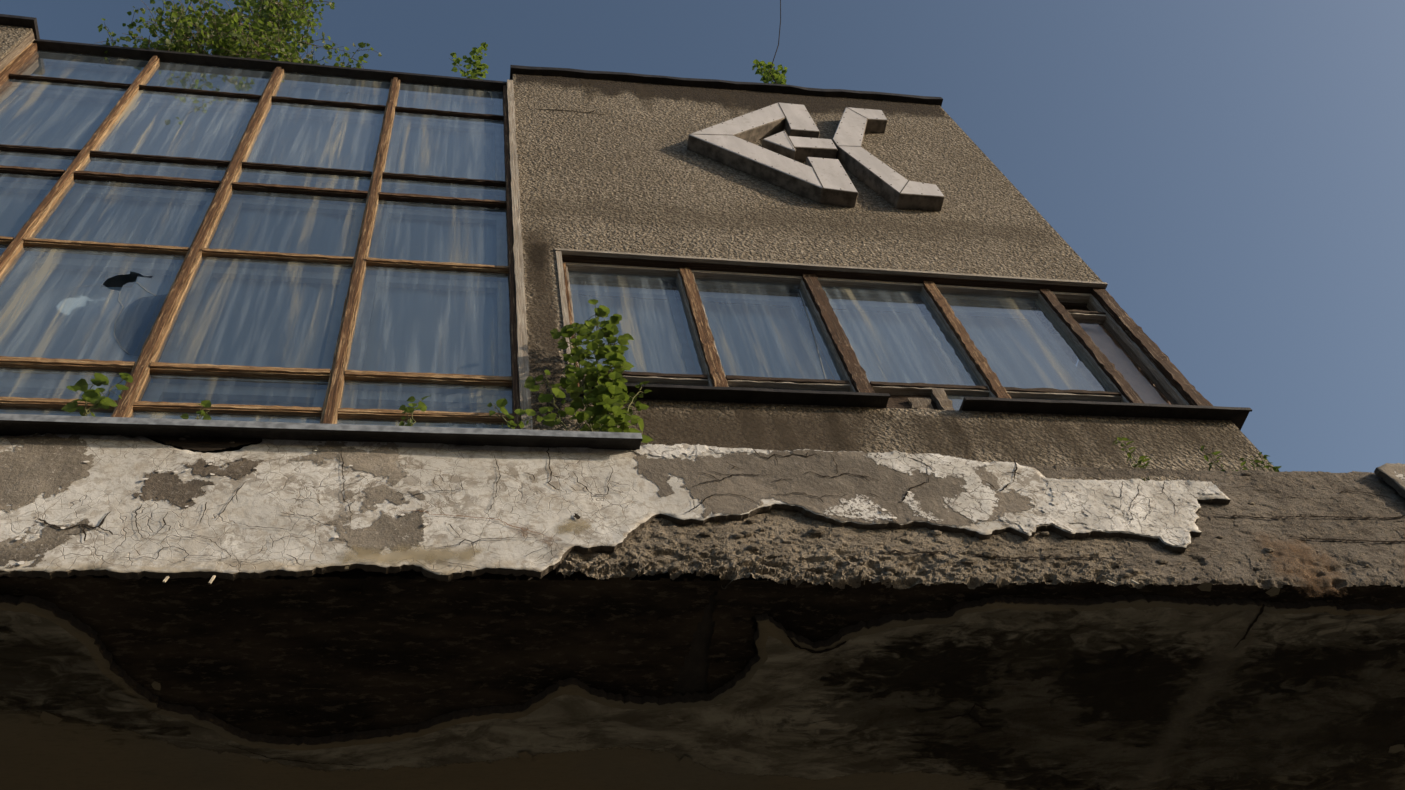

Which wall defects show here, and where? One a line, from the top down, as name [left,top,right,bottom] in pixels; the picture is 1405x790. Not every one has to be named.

crack [38,455,367,565]
crack [397,447,628,568]
crack [685,449,932,513]
crack [878,550,1129,561]
crack [982,459,1038,492]
crack [1104,481,1405,543]
peeling [0,434,1405,790]
water stain [0,627,190,738]
water stain [820,631,1405,790]